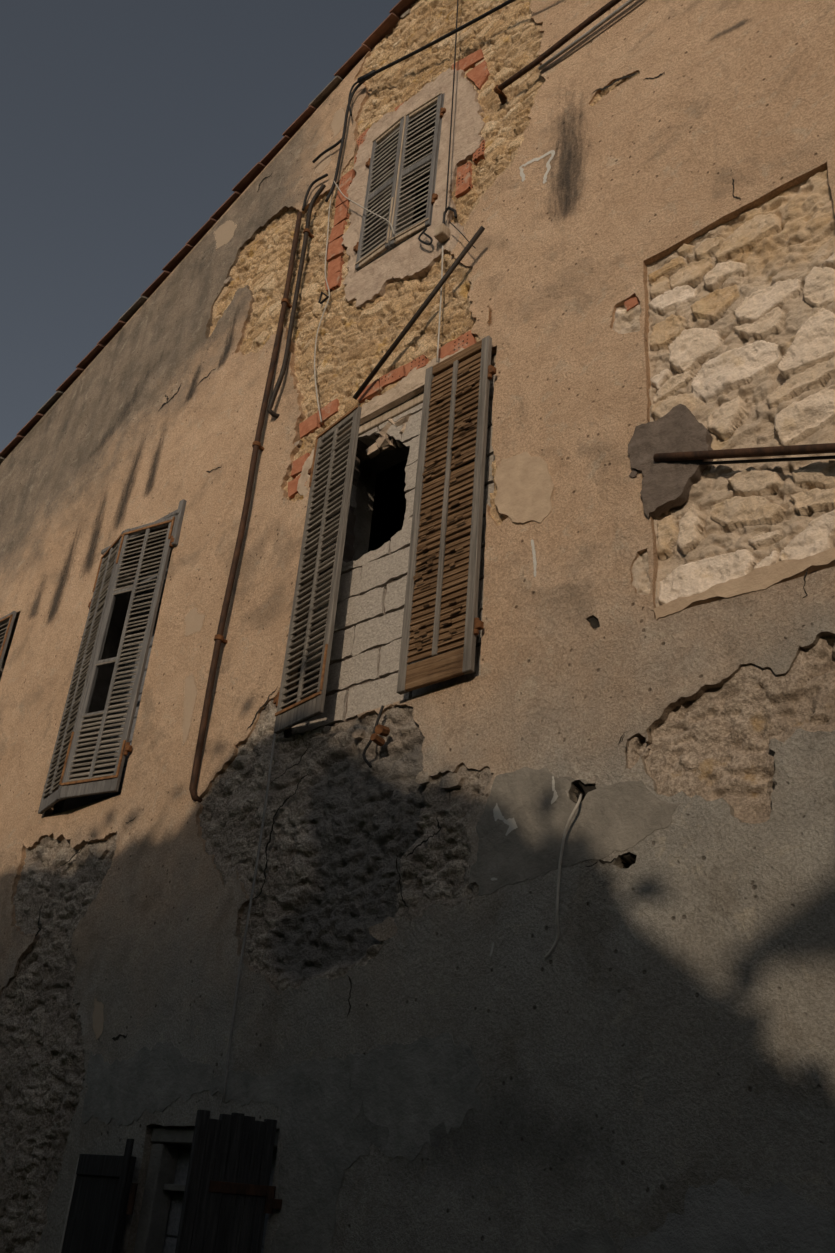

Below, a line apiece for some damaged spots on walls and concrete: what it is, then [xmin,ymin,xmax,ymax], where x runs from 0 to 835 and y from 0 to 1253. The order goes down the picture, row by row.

spalling [209,0,545,502]
spalling [632,551,656,595]
spalling [199,635,835,993]